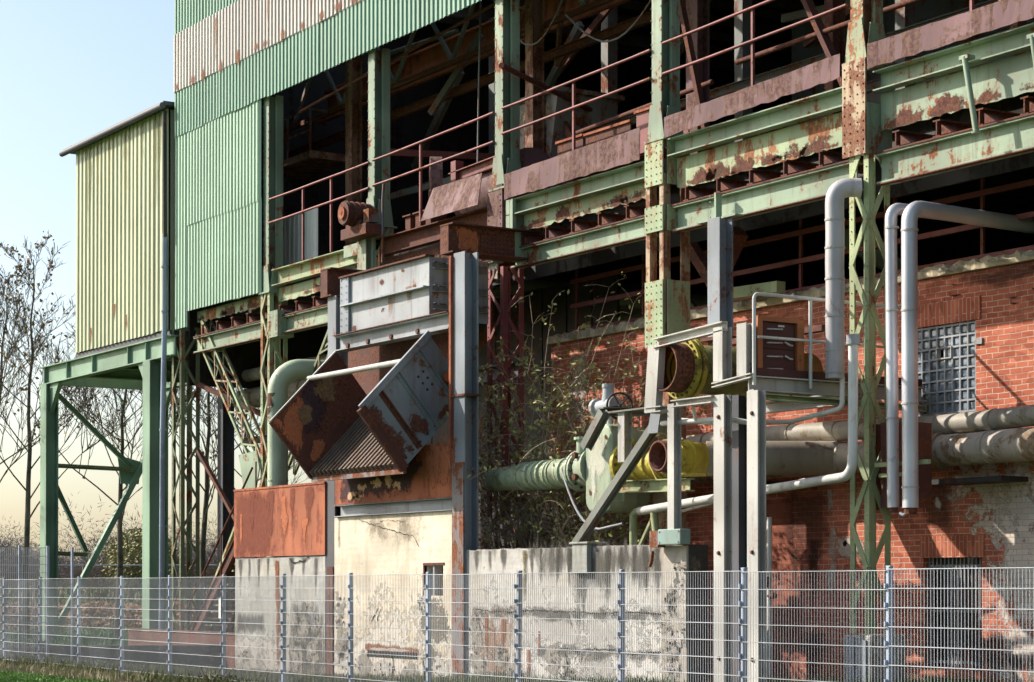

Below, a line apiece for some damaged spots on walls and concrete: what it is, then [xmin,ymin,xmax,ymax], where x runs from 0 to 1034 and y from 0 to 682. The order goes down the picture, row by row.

corrosion [887,89,1001,129]
corrosion [687,135,838,185]
corrosion [267,393,325,462]
corrosion [369,404,449,459]
corrosion [235,487,314,557]
damp [473,541,661,623]
spalling [287,602,320,671]
spalling [333,592,419,679]
spalling [432,654,449,679]
damp [537,645,658,661]
spalling [657,561,687,682]